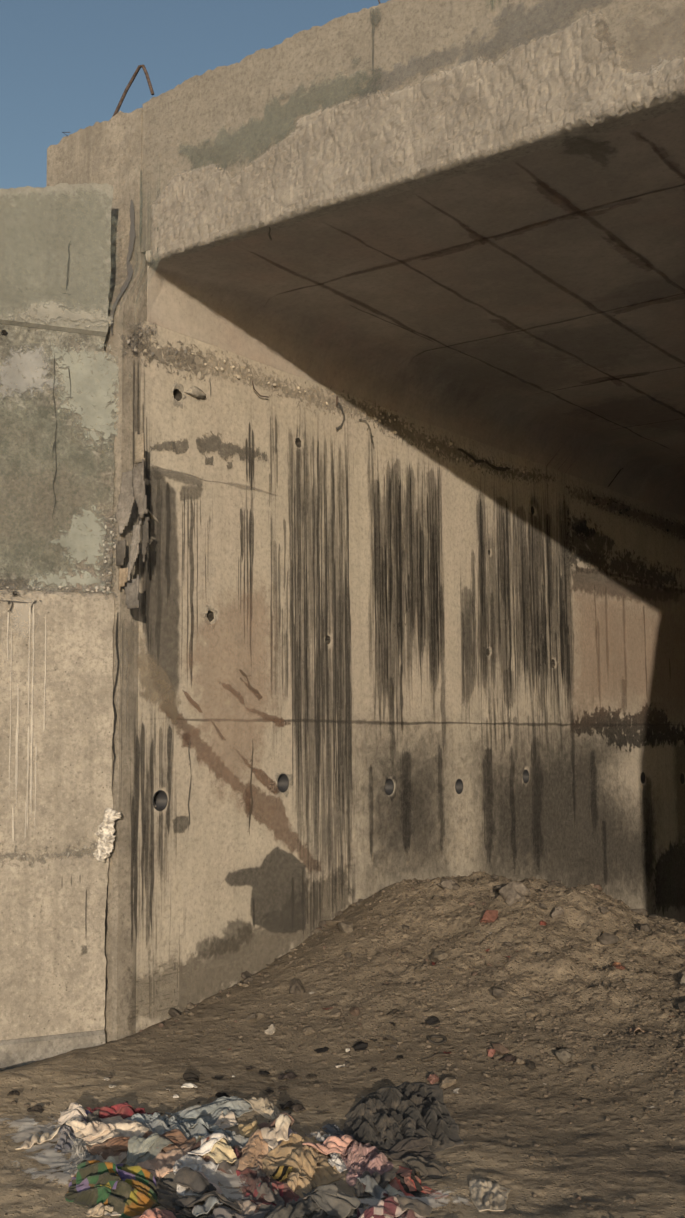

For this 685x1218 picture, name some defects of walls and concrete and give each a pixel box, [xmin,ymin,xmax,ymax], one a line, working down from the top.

crack [110,200,136,334]
water stain [130,430,354,1023]
water stain [369,468,445,732]
water stain [462,496,685,752]